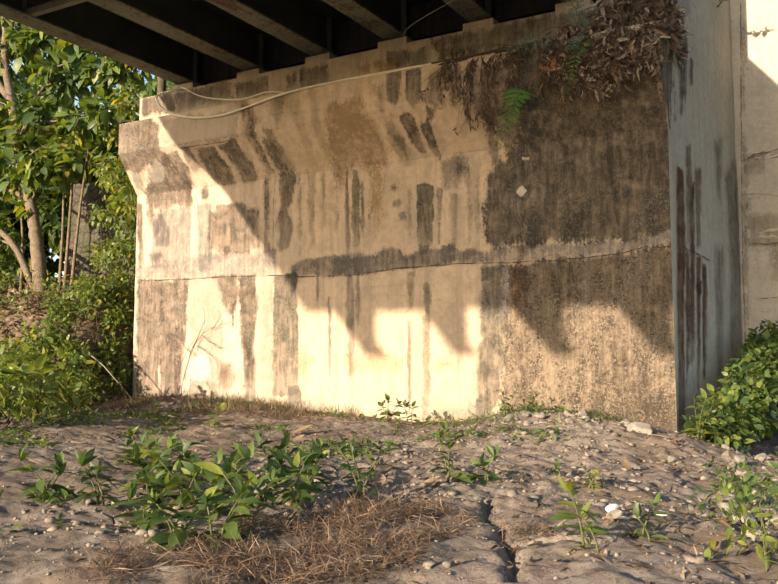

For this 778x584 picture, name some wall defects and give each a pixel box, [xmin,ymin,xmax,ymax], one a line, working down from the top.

water stain [142,77,268,116]
water stain [379,46,425,104]
water stain [135,139,671,419]
water stain [394,105,462,176]
crack [154,172,709,419]
water stain [587,394,677,431]
rust [677,166,706,427]
crack [740,1,778,353]